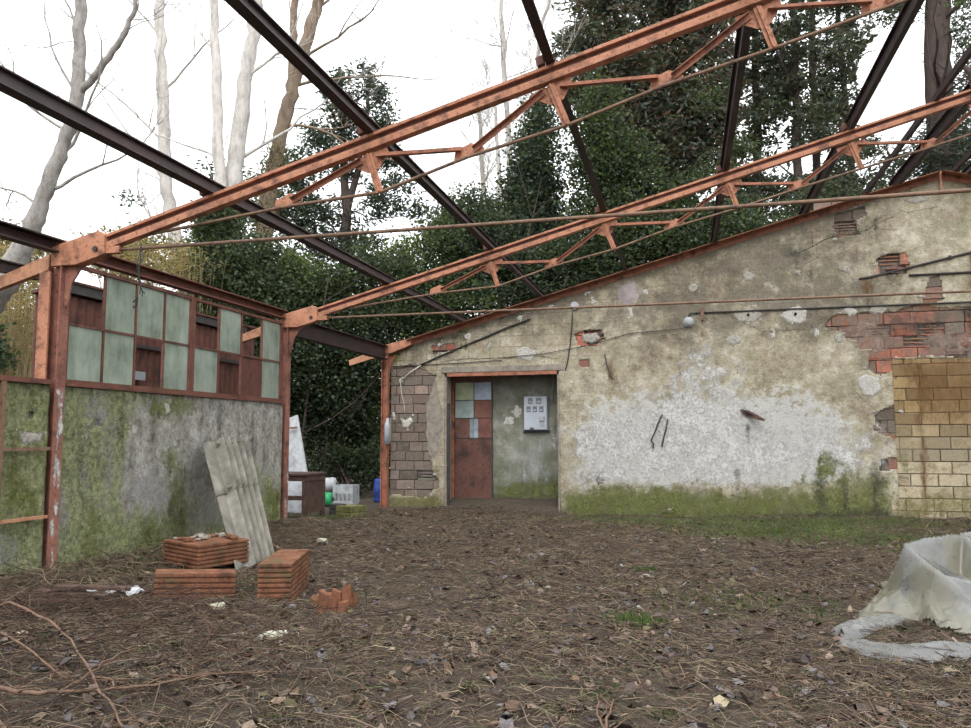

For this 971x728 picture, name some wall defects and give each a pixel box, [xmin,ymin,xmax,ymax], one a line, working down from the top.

spalling [873,251,915,276]
spalling [390,363,444,499]